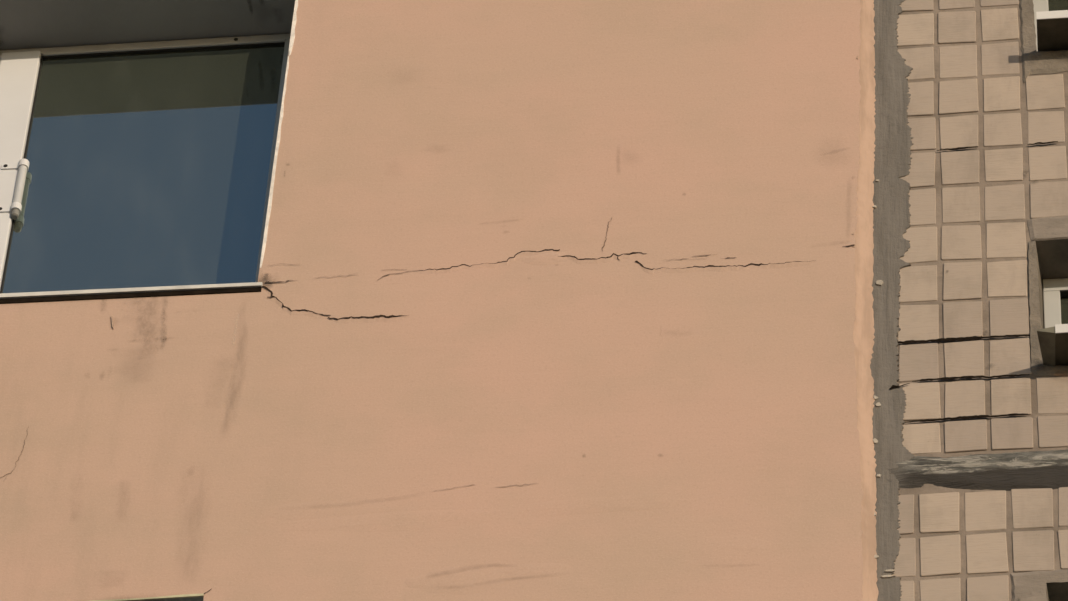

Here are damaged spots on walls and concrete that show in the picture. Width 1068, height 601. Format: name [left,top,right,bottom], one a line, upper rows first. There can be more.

crack [378,218,815,280]
crack [262,263,409,324]